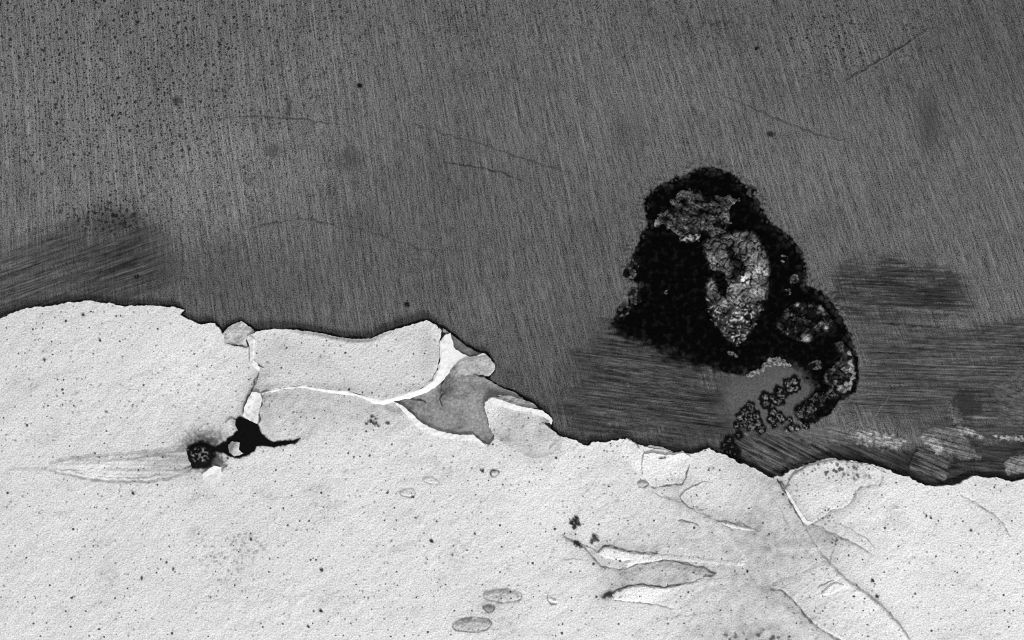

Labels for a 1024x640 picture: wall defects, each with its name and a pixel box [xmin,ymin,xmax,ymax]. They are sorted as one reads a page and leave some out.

corrosion [611,160,862,462]
peeling [223,320,562,459]
corrosion [185,435,227,481]
peeling [621,437,716,510]
crack [814,525,871,562]